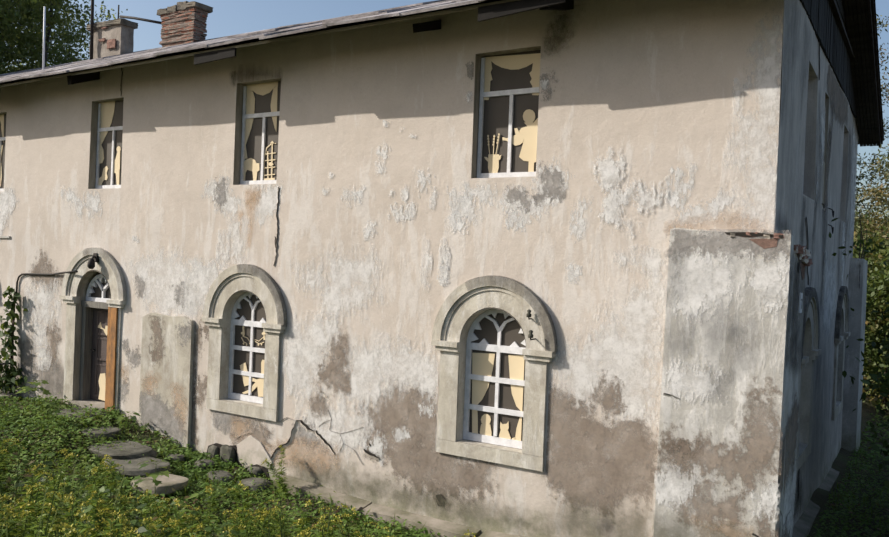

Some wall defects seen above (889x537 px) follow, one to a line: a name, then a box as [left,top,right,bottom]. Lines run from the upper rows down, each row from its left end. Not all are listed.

crack [272,187,280,266]
peeling [387,157,572,234]
flaking render [545,15,813,537]
crack [804,217,812,285]
peeling [119,170,282,481]
flaking render [281,243,499,509]
crack [271,410,379,465]